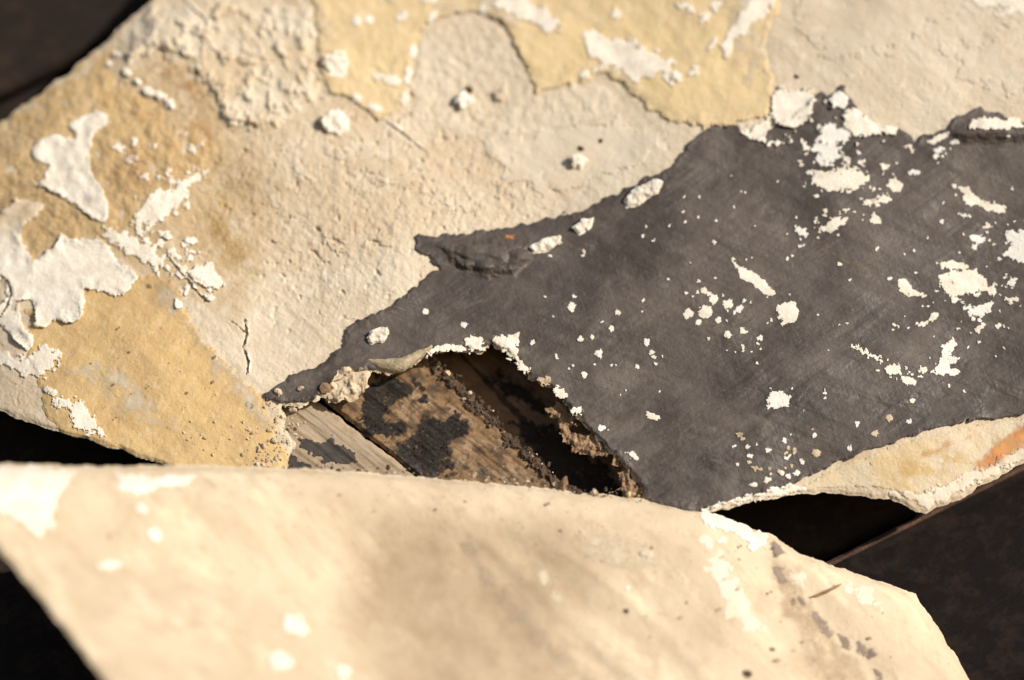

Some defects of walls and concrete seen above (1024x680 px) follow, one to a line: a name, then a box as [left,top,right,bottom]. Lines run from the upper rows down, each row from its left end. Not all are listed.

spalling [104,0,349,137]
spalling [320,91,382,137]
peeling [352,15,374,27]
peeling [372,0,699,198]
peeling [675,0,722,24]
peeling [707,0,775,59]
peeling [0,110,225,437]
crack [231,318,252,375]
peeling [683,257,799,364]
peeling [0,321,1024,680]